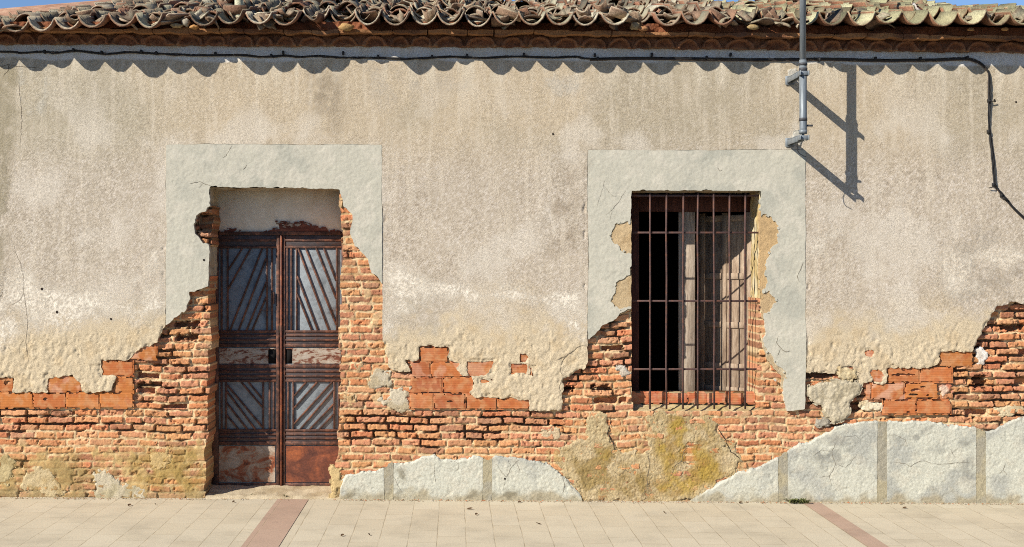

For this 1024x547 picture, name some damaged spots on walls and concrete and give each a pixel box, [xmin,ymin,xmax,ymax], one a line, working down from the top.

spalling [195,206,241,247]
spalling [0,276,220,498]
spalling [328,193,1024,501]